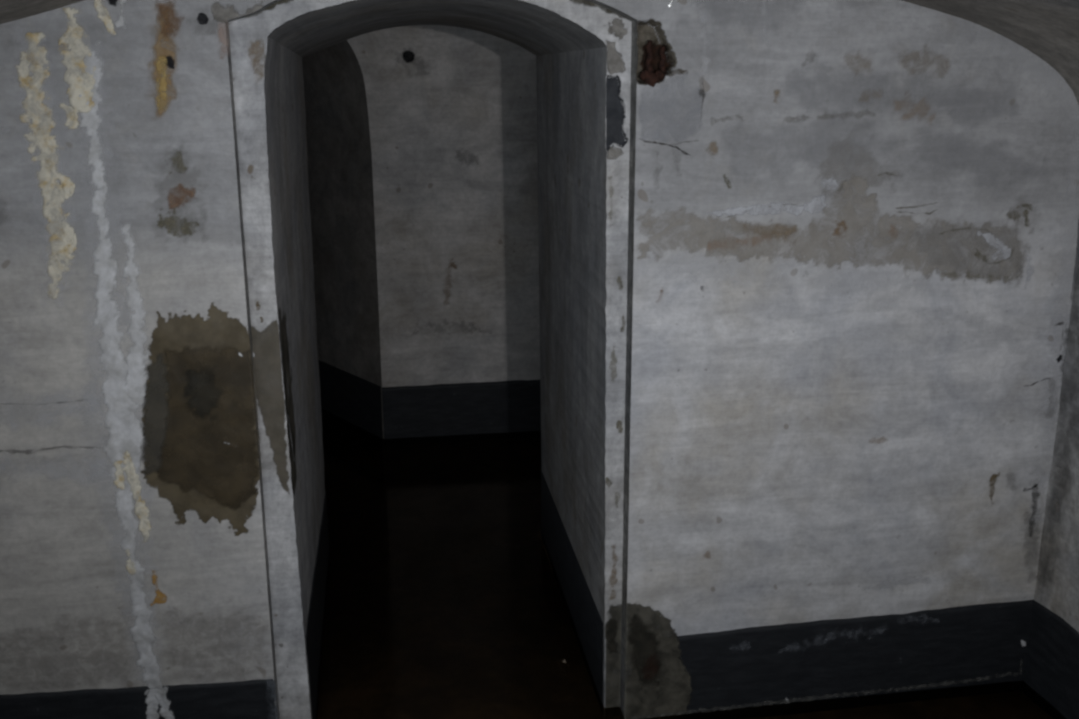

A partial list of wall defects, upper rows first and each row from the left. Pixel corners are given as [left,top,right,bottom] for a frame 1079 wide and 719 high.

corrosion [153,4,180,116]
spalling [606,18,687,159]
peeling [638,172,1031,281]
damp [16,8,297,719]
damp [605,603,692,719]